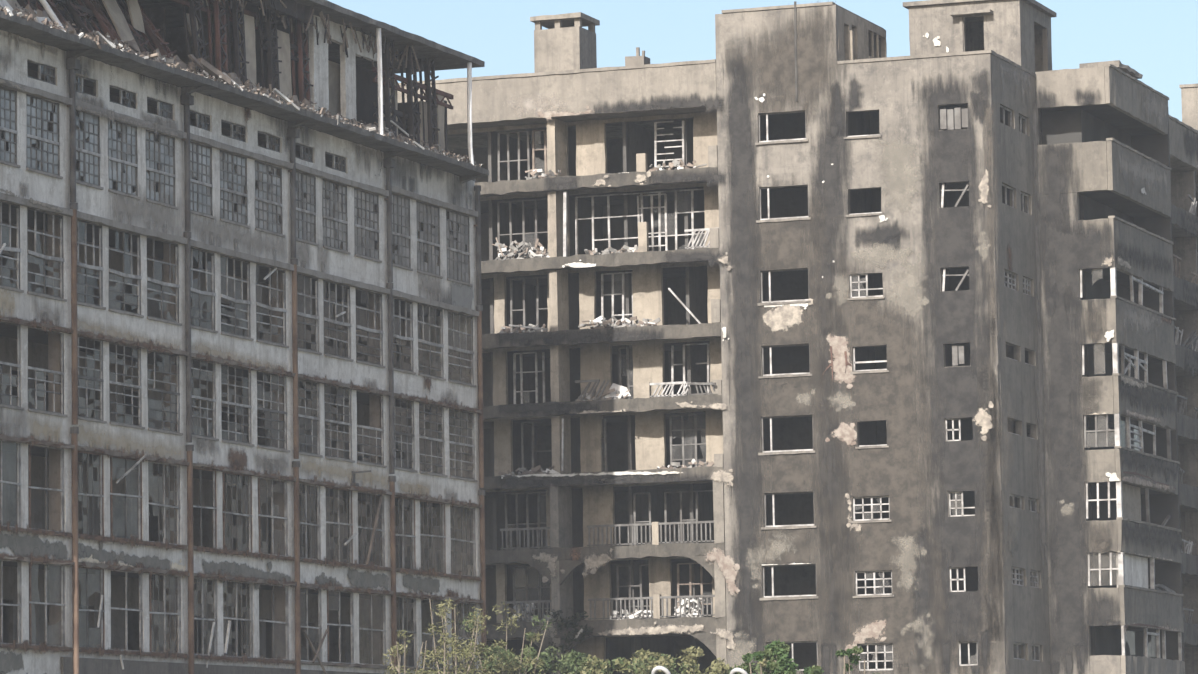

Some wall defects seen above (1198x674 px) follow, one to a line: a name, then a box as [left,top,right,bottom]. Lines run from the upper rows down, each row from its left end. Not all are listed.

spalling [762,276,849,333]
water stain [594,10,1182,674]
spalling [825,333,857,446]
spalling [972,401,994,441]
peeling [0,532,186,578]
peeling [202,559,291,590]
spalling [532,552,565,583]
spalling [582,548,613,577]
spalling [705,535,809,597]
peeling [0,647,24,674]
spalling [845,620,887,655]
spalling [901,613,931,667]